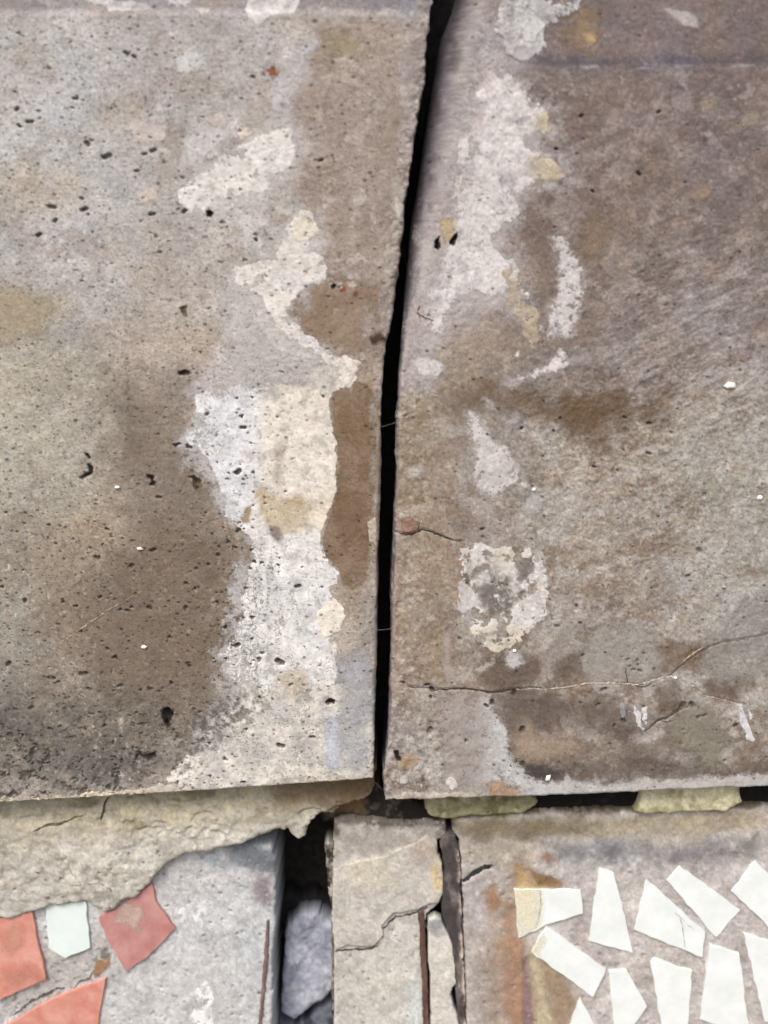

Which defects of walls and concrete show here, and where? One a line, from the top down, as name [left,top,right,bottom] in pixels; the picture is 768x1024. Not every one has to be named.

water stain [423,66,592,387]
water stain [295,252,386,360]
water stain [243,490,308,541]
water stain [323,381,378,589]
crack [394,523,459,542]
water stain [429,387,529,551]
water stain [165,652,375,790]
crack [410,633,768,731]
crack [334,907,426,952]
rust [506,868,560,1024]